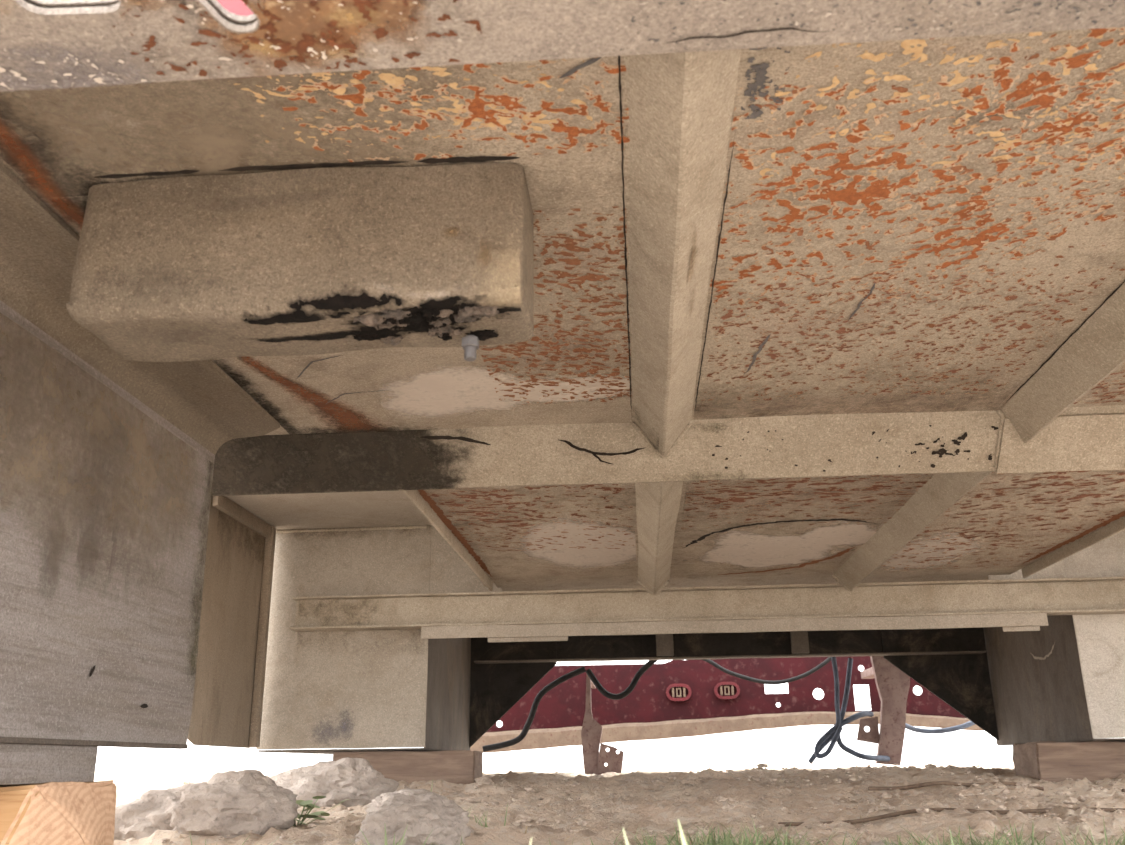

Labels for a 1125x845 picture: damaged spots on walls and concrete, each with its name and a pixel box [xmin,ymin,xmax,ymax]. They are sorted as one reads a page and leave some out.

corrosion [112,0,220,77]
corrosion [172,0,630,163]
crack [559,56,632,414]
corrosion [701,27,1125,404]
corrosion [479,206,632,405]
corrosion [219,355,410,435]
leakage [420,436,491,445]
crack [560,440,644,464]
spalling [898,425,970,468]
corrosion [418,484,634,576]
corrosion [681,474,932,530]
corrosion [882,470,1125,570]